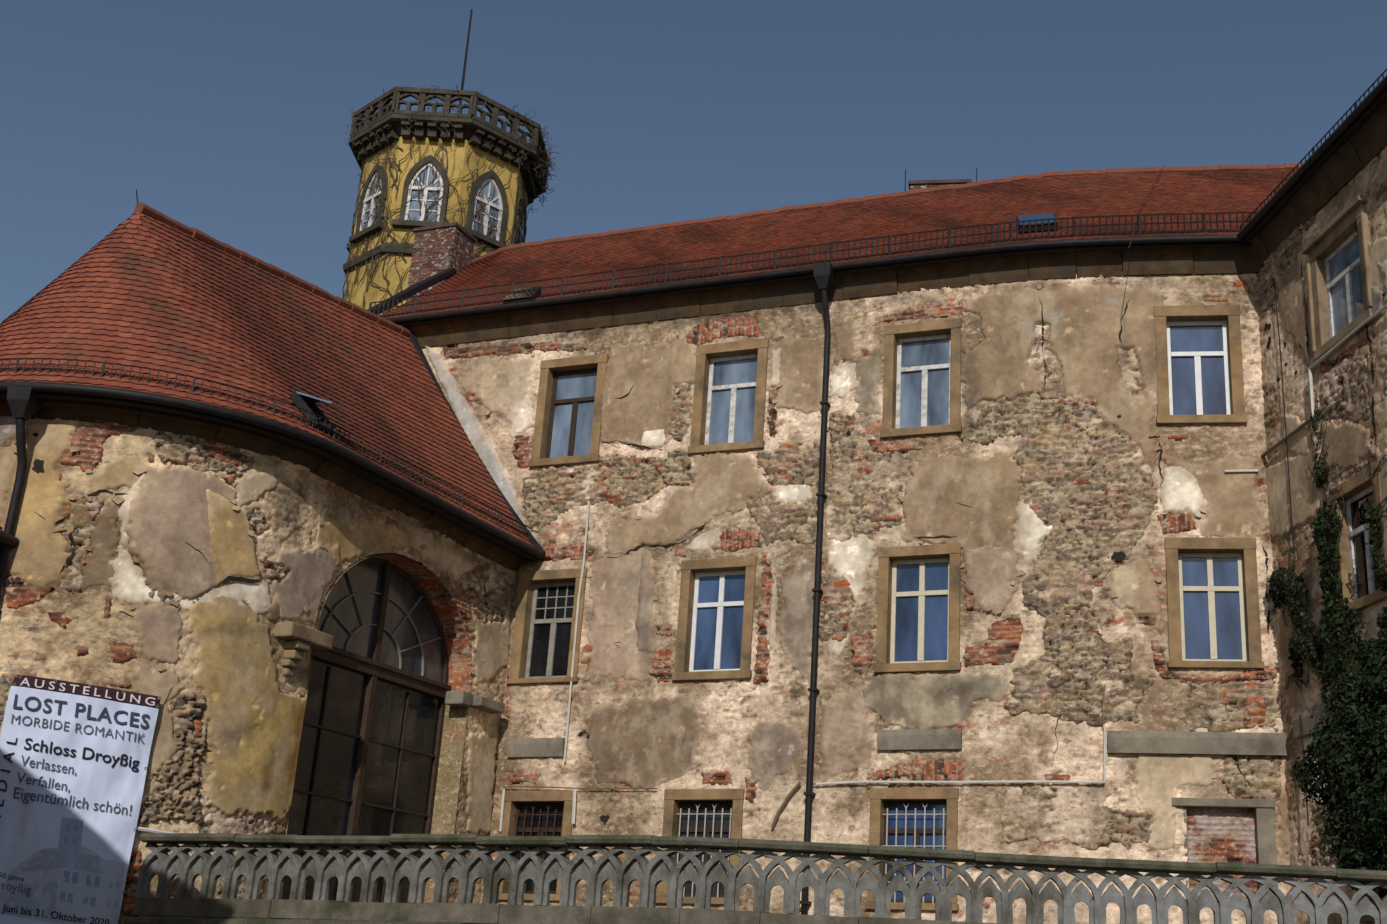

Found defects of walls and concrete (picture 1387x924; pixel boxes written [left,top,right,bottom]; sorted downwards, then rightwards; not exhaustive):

crack [1036,298,1055,402]
flaking render [441,214,1387,803]
flaking render [0,420,539,835]
spalling [1001,754,1291,855]
spalling [1303,731,1349,866]
flaking render [121,851,142,917]